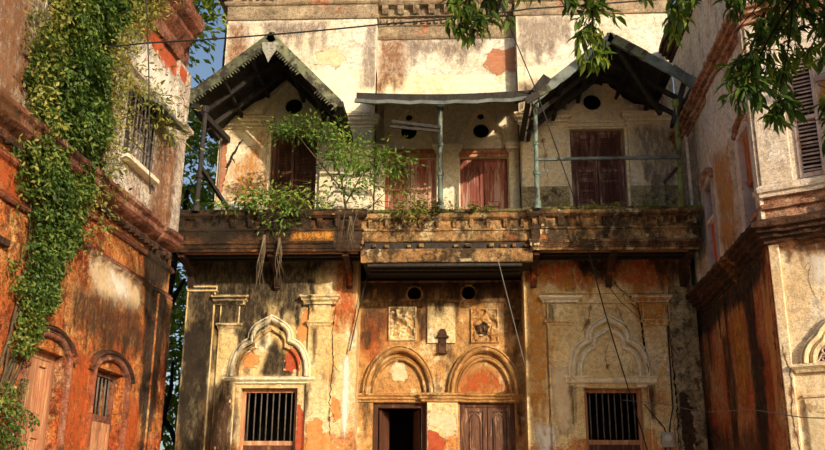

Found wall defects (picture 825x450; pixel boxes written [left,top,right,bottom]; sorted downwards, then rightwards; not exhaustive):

flaking render [483,46,516,76]
crack [224,139,243,181]
damp [774,238,825,281]
damp [74,135,331,450]
peeling [241,350,260,370]
damp [696,252,770,450]
flaking render [427,410,458,450]